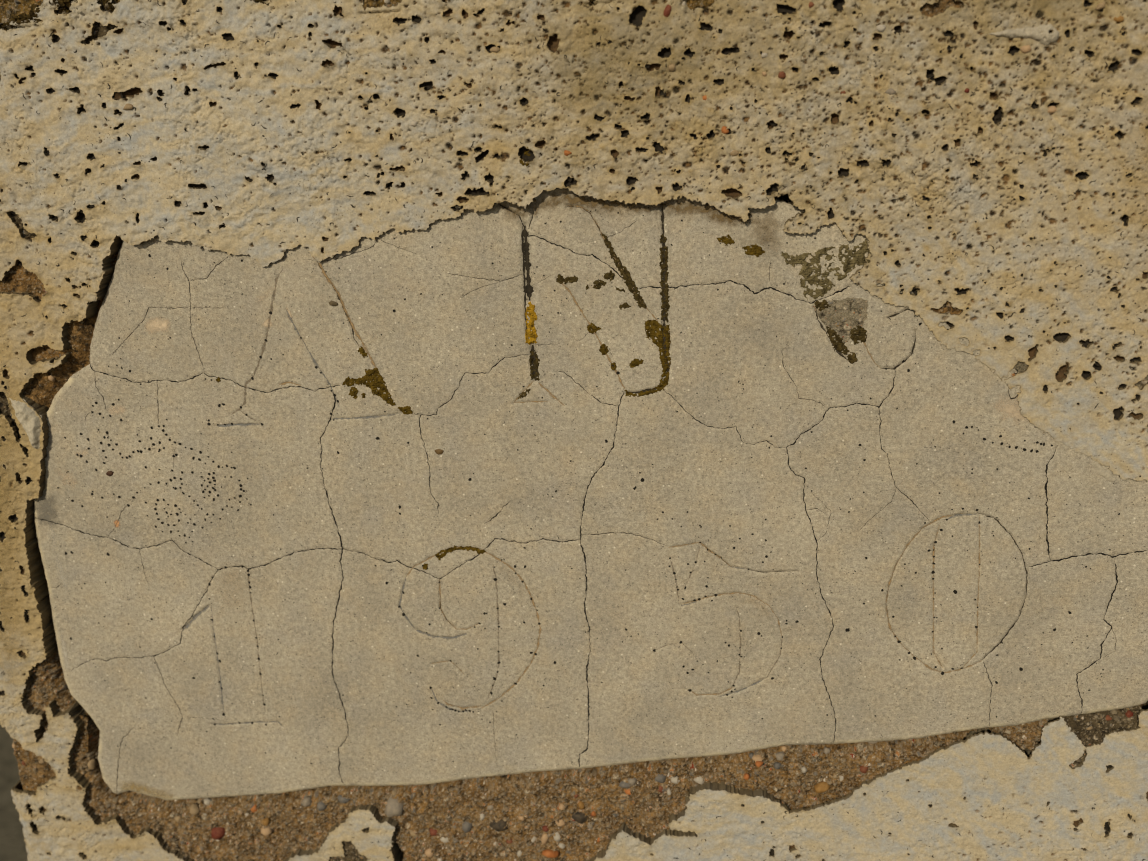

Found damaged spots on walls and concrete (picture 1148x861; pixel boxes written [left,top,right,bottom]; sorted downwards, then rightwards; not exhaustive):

spalling [82,0,124,44]
spalling [629,6,647,31]
spalling [0,261,47,301]
spalling [73,201,105,255]
crack [527,221,849,304]
spalling [931,288,969,330]
spalling [0,298,104,452]
spalling [1113,375,1148,420]
crack [36,258,664,781]
crack [667,347,929,743]
crack [1028,450,1147,713]
spalling [26,651,1142,861]